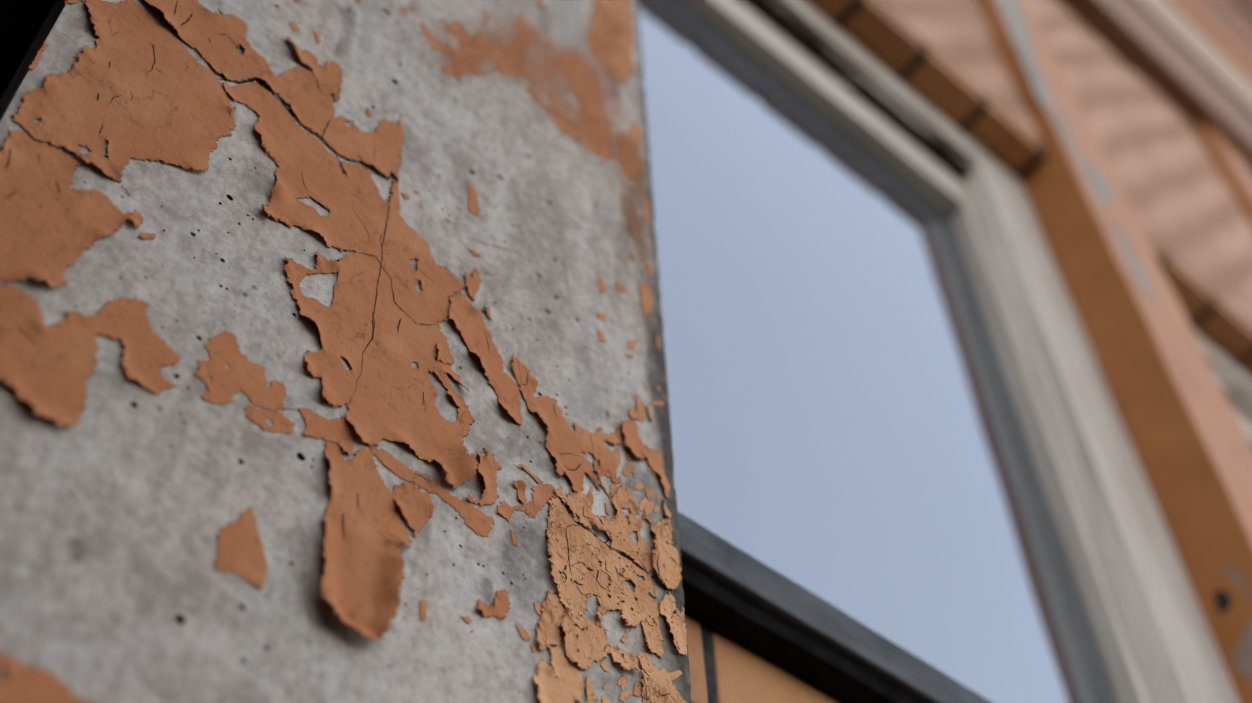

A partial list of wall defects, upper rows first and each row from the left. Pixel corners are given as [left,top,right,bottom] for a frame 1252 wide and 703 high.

crack [97,42,162,134]
crack [174,0,439,402]
peeling [0,0,671,642]
peeling [0,651,96,703]